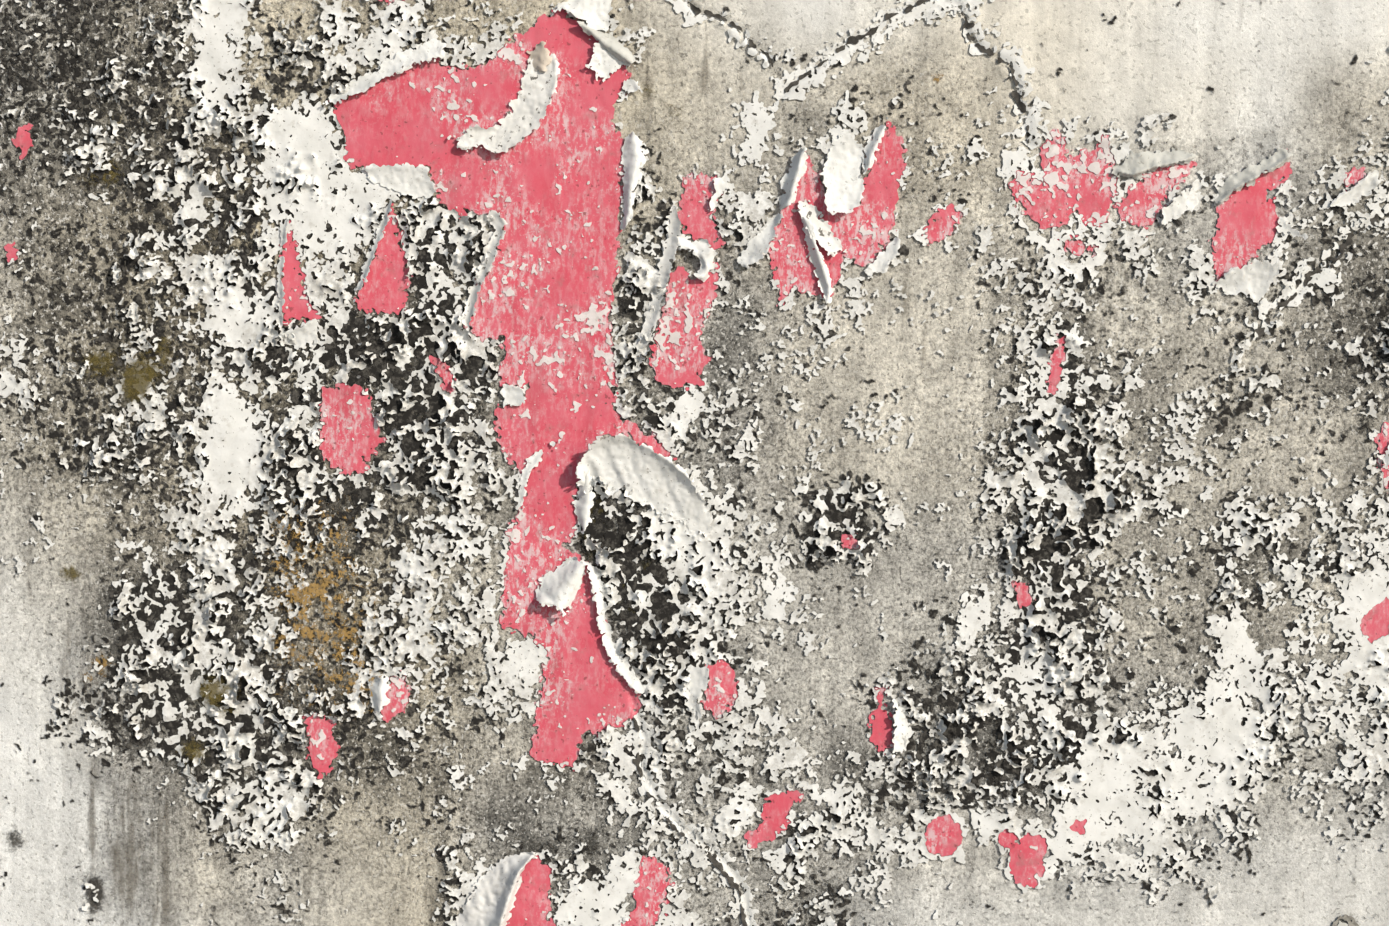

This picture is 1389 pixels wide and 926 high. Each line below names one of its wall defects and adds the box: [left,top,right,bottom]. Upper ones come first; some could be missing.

crack [666,0,1051,147]
peeling [769,0,995,100]
damp [0,0,257,269]
crack [1240,198,1389,358]
damp [1274,274,1389,407]
peeling [844,379,914,453]
peeling [911,502,950,520]
peeling [934,553,952,581]
peeling [1138,636,1168,666]
peeling [376,816,418,856]
peeling [493,821,516,842]
peeling [245,866,312,922]